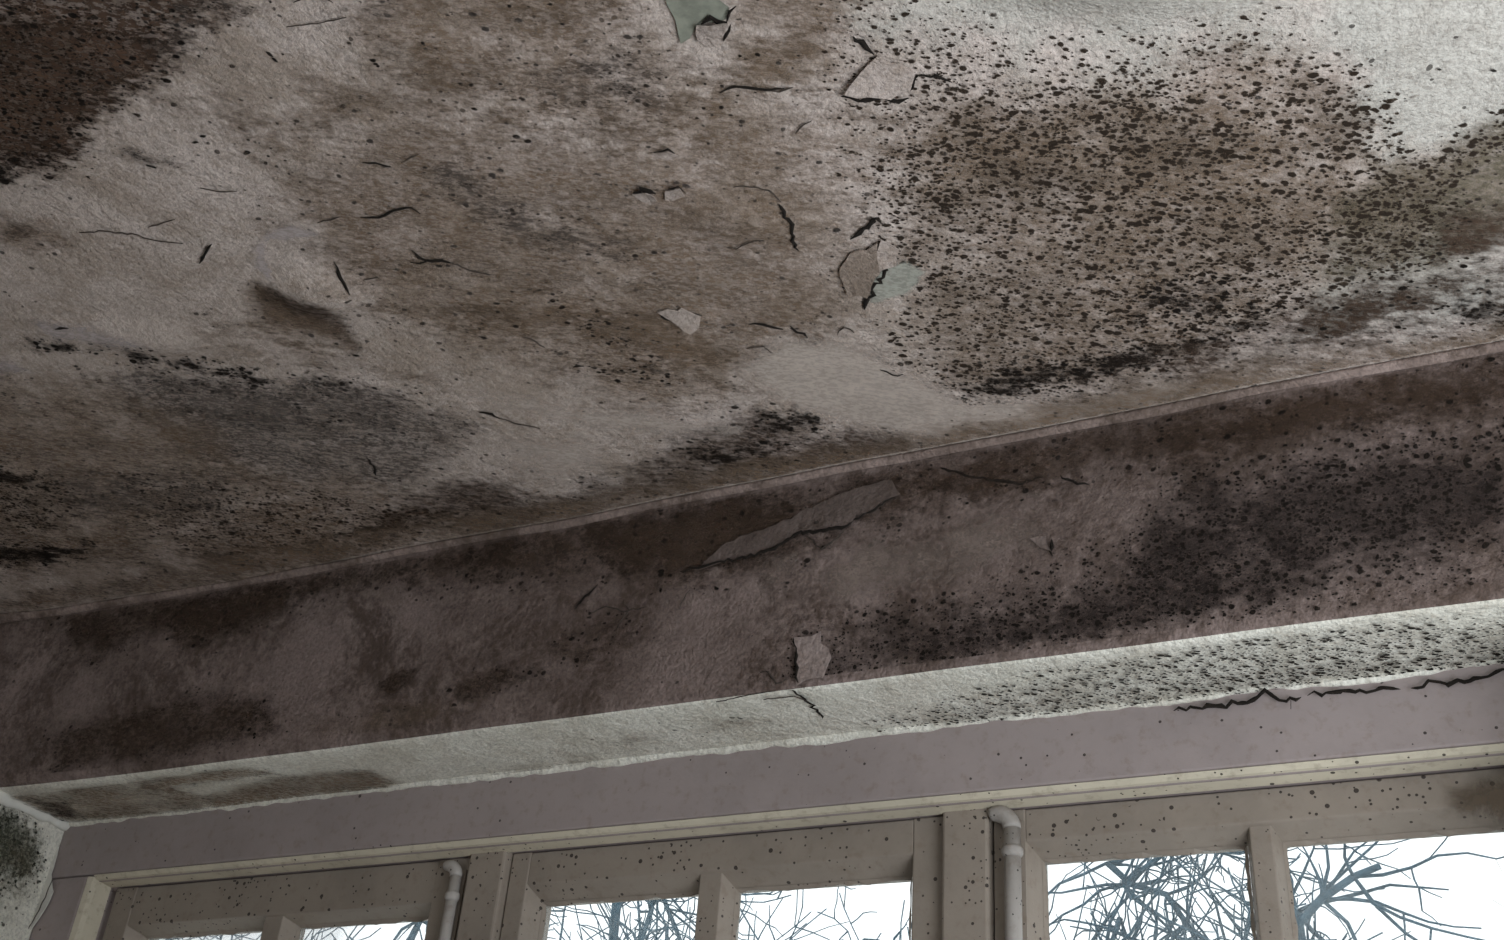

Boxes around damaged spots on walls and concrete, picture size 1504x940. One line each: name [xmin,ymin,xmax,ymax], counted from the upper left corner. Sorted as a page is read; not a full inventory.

peeling [666,0,736,48]
peeling [839,217,924,310]
water stain [0,0,1504,677]
peeling [680,480,901,573]
water stain [316,610,657,734]
peeling [760,631,831,685]
water stain [864,614,1504,732]
water stain [0,684,399,927]